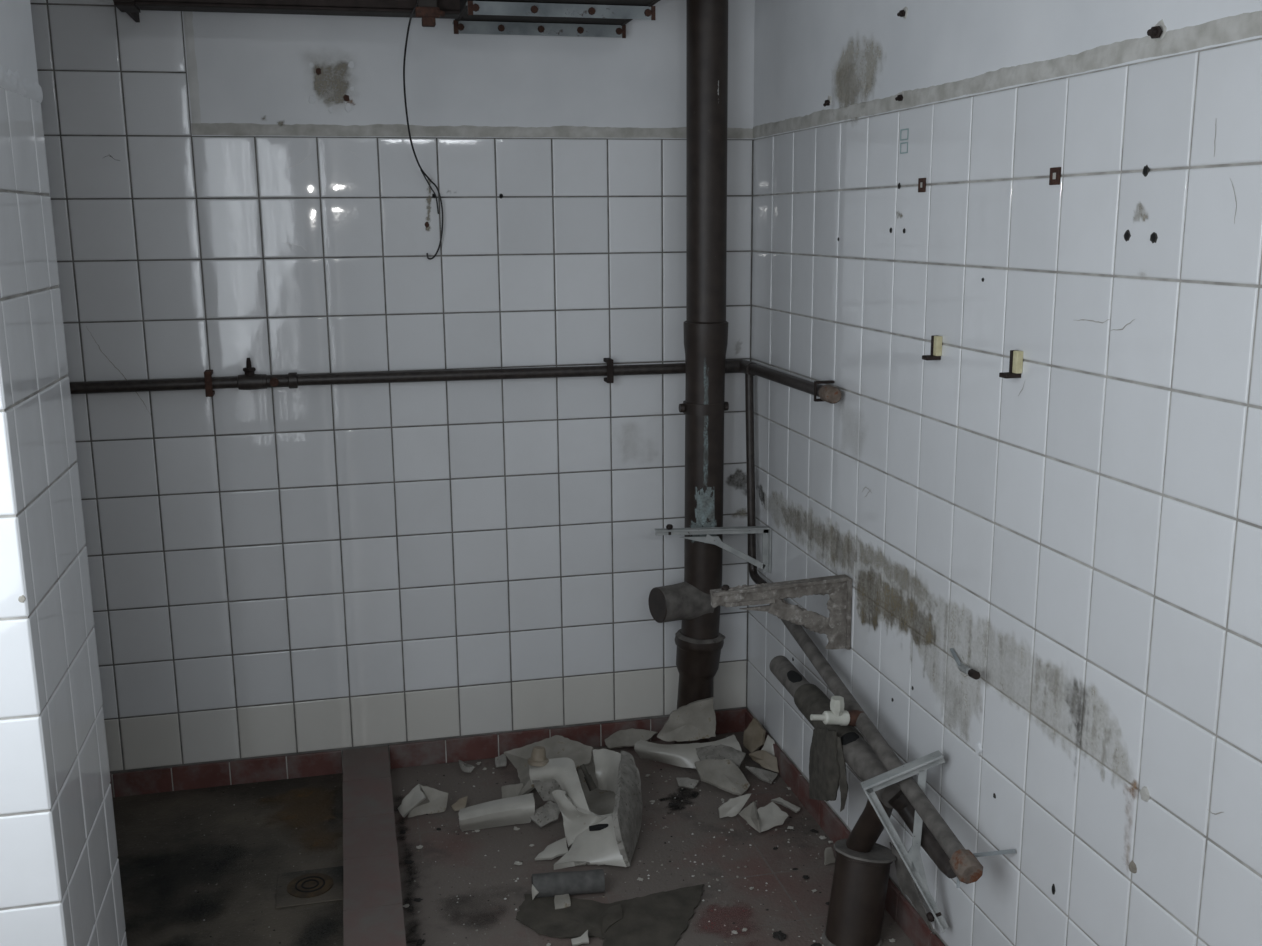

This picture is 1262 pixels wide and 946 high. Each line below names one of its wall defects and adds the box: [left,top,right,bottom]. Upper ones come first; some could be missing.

flaking render [308,60,355,113]
leakage [836,41,881,106]
leakage [811,527,935,644]